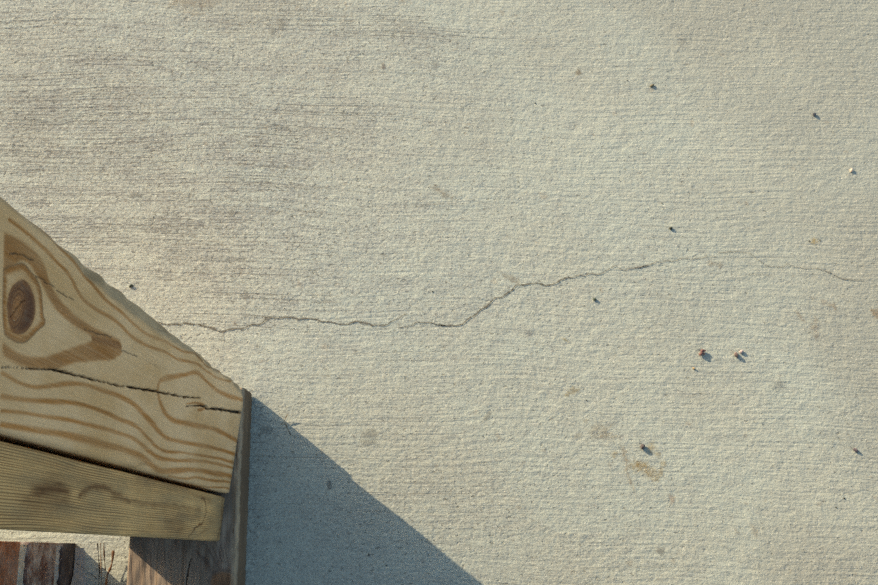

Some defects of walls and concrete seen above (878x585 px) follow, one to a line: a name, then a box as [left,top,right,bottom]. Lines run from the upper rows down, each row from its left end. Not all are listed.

crack [158,251,863,344]